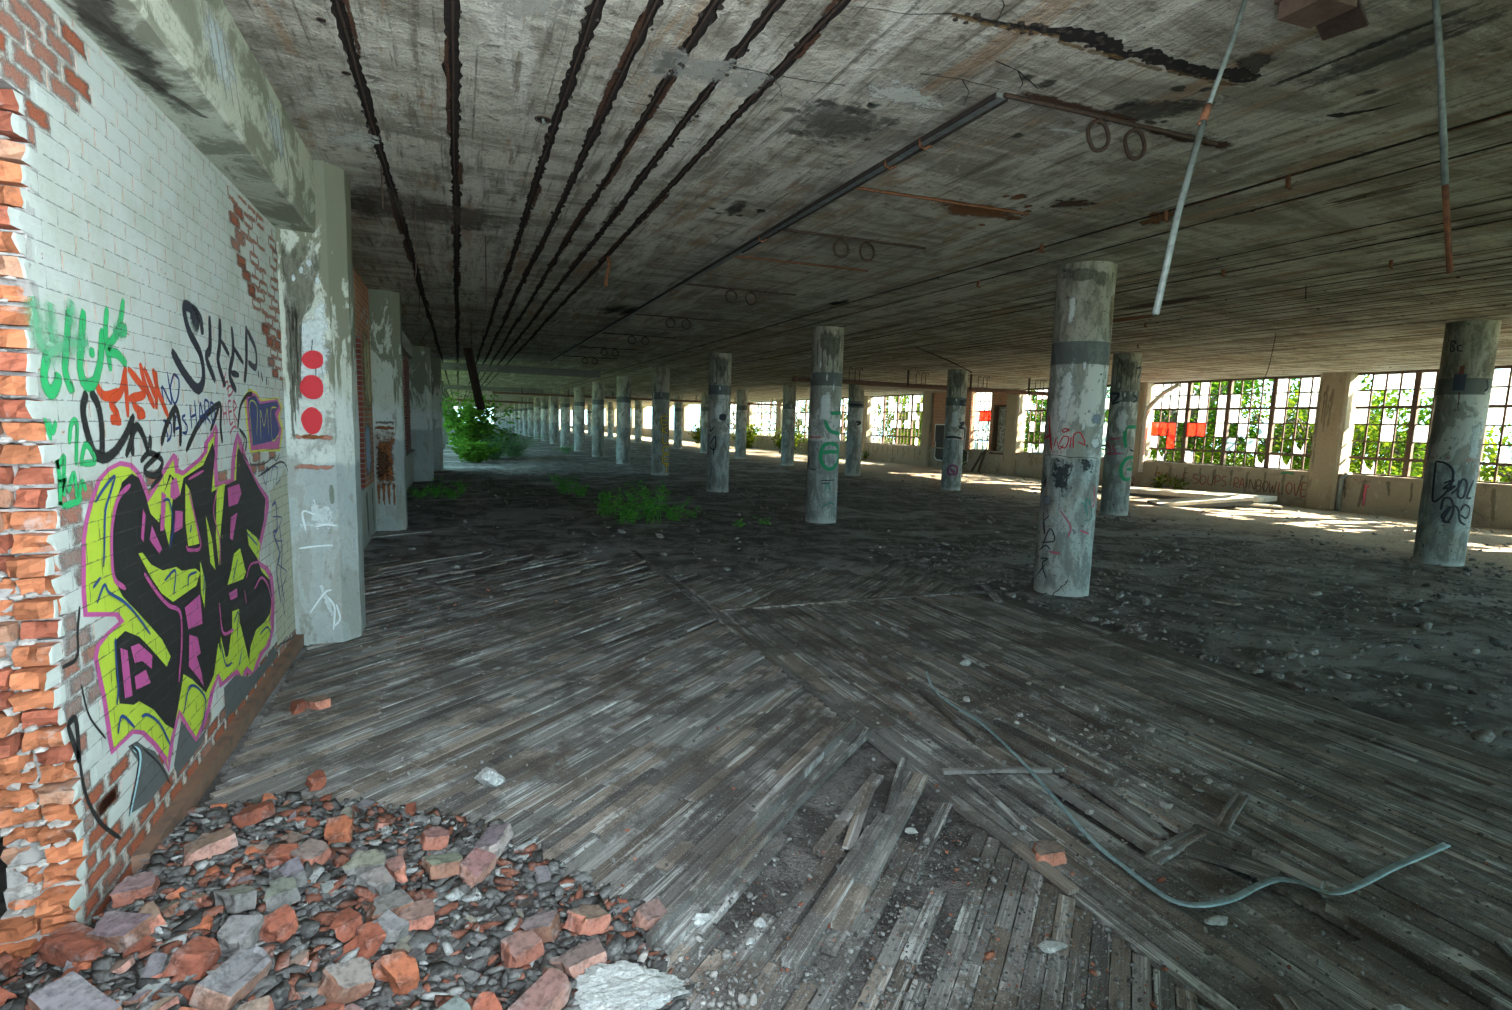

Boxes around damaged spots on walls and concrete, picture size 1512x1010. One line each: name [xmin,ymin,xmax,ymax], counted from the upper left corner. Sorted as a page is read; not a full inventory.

peeling [0,0,91,146]
crack [830,0,1276,104]
spalling [335,0,845,386]
corrosion [856,187,1032,226]
corrosion [1050,198,1097,210]
spalling [1109,110,1512,236]
peeling [227,186,328,395]
peeling [361,309,394,430]
spalling [671,246,1076,430]
spalling [1113,196,1512,376]